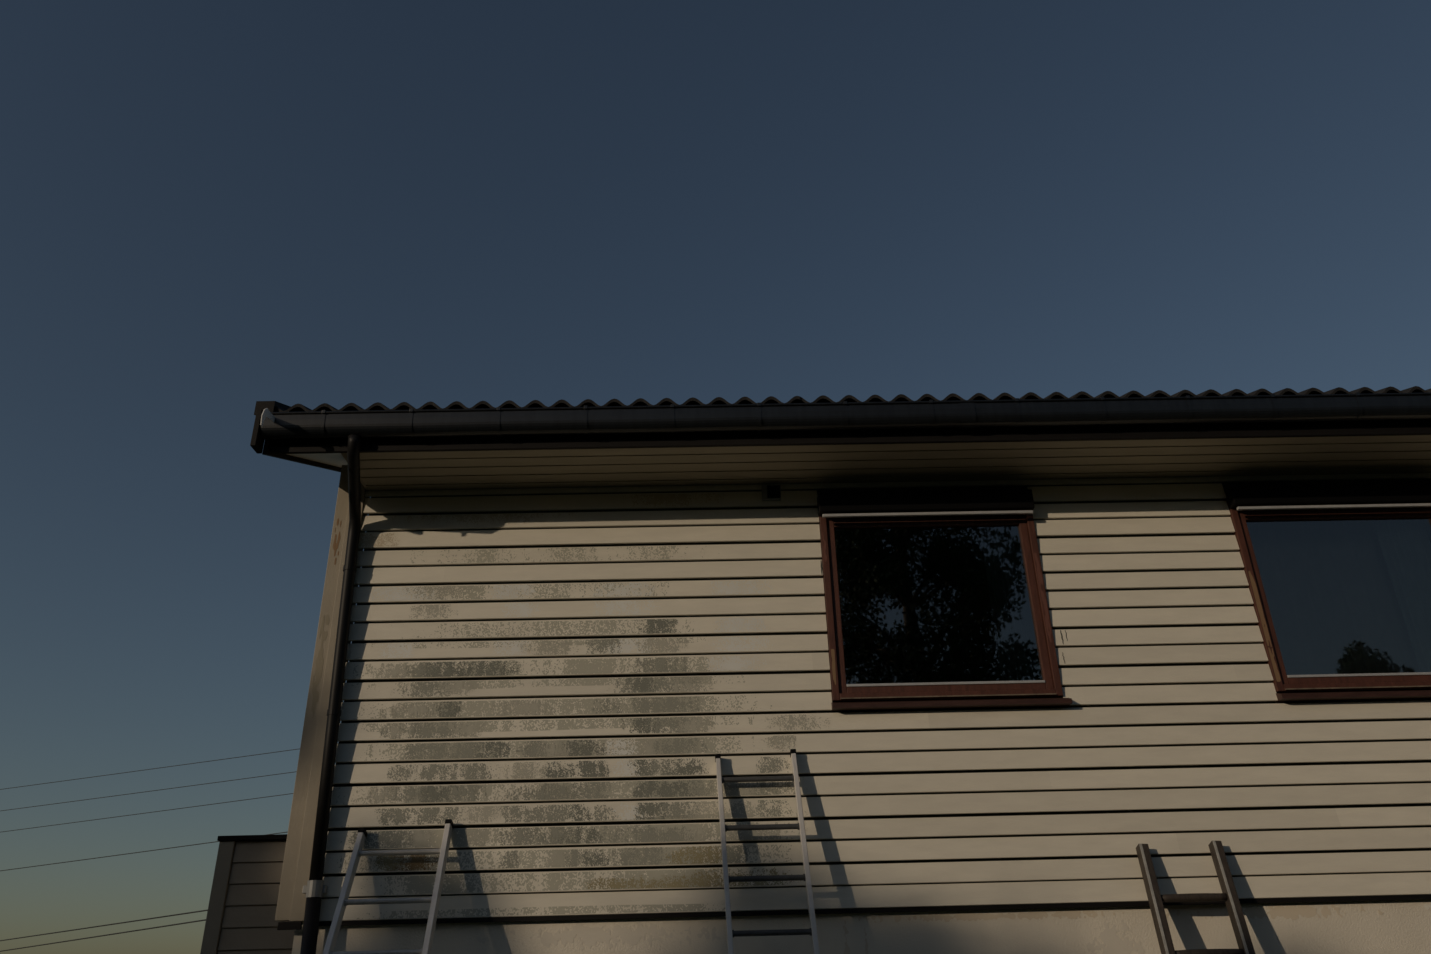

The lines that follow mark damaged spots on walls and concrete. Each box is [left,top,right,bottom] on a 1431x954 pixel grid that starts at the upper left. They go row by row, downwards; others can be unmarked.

water stain [348,580,831,889]